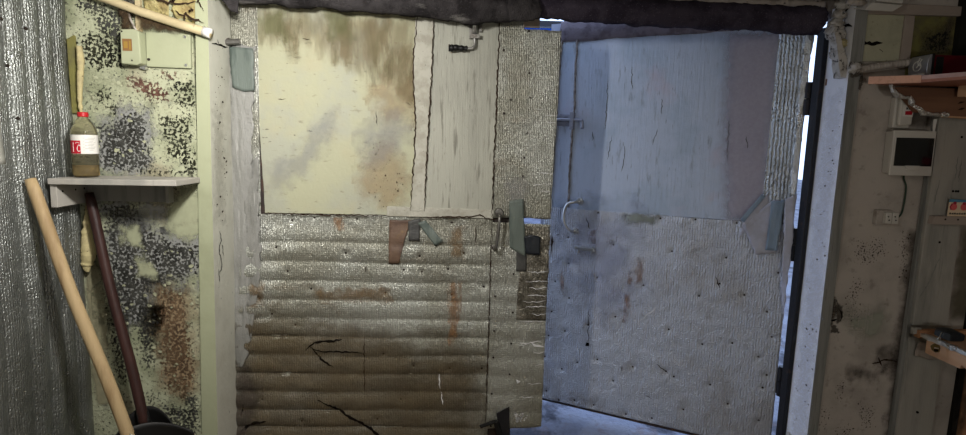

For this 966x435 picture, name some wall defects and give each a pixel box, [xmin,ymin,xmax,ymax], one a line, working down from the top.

leakage [76,0,135,72]
spalling [119,0,203,32]
leakage [141,79,198,186]
leakage [103,217,200,434]